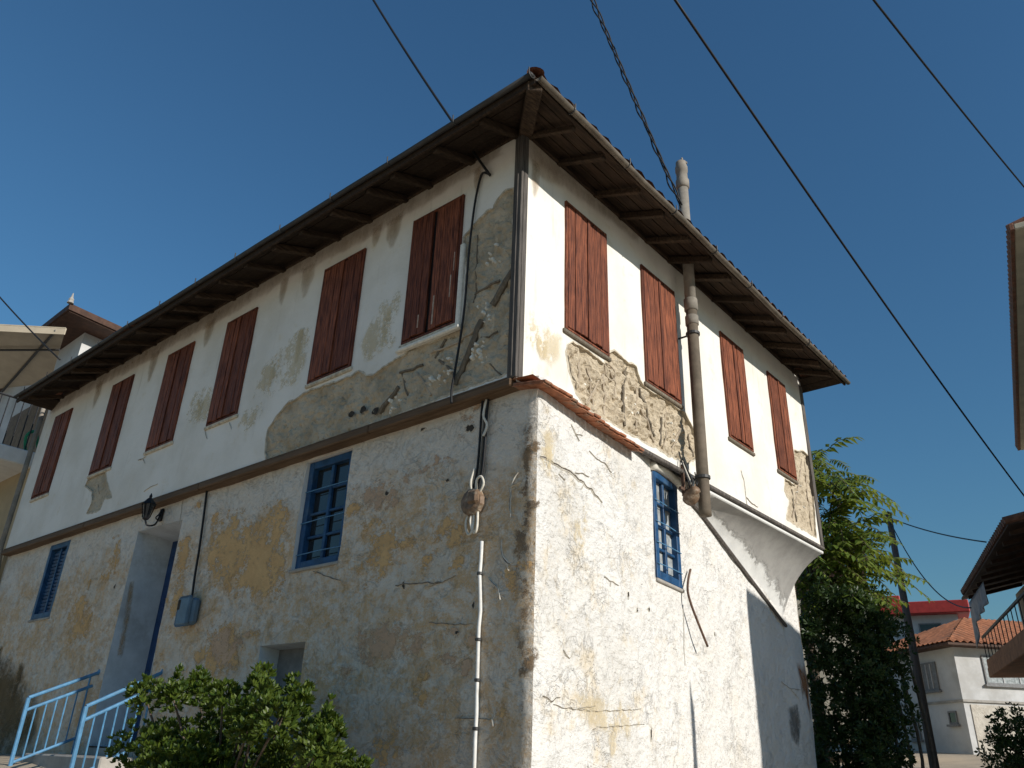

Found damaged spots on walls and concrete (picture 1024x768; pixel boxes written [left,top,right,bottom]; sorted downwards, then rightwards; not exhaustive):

flaking render [264,187,514,460]
flaking render [565,341,695,465]
flaking render [84,472,112,514]
crack [540,424,612,503]
peeling [711,449,821,610]
crack [395,575,456,587]
crack [543,696,645,729]